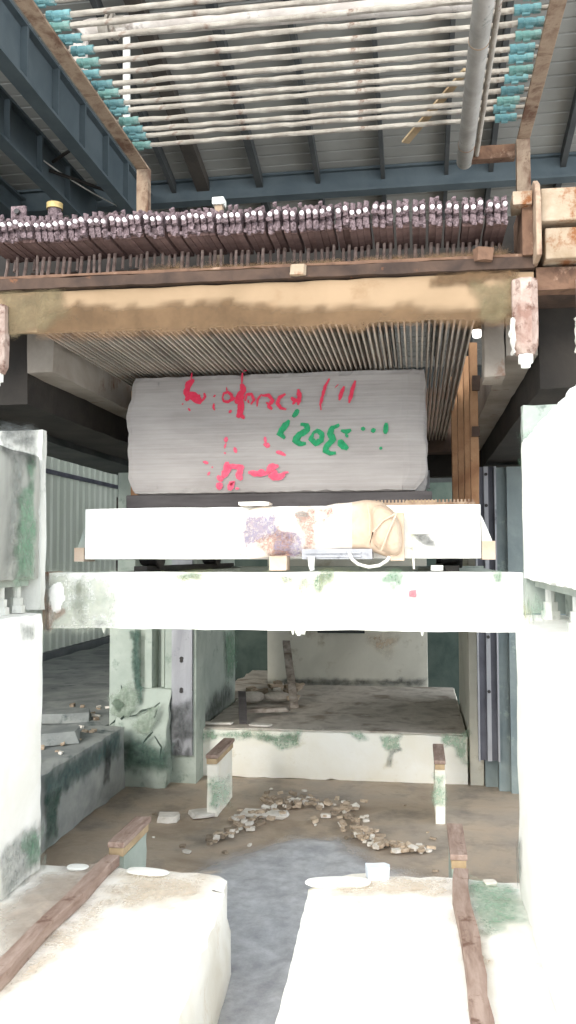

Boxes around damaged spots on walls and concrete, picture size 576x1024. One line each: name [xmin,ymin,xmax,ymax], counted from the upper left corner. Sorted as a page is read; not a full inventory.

water stain [0,289,61,335]
water stain [2,426,36,575]
water stain [45,703,300,838]
water stain [382,737,400,764]